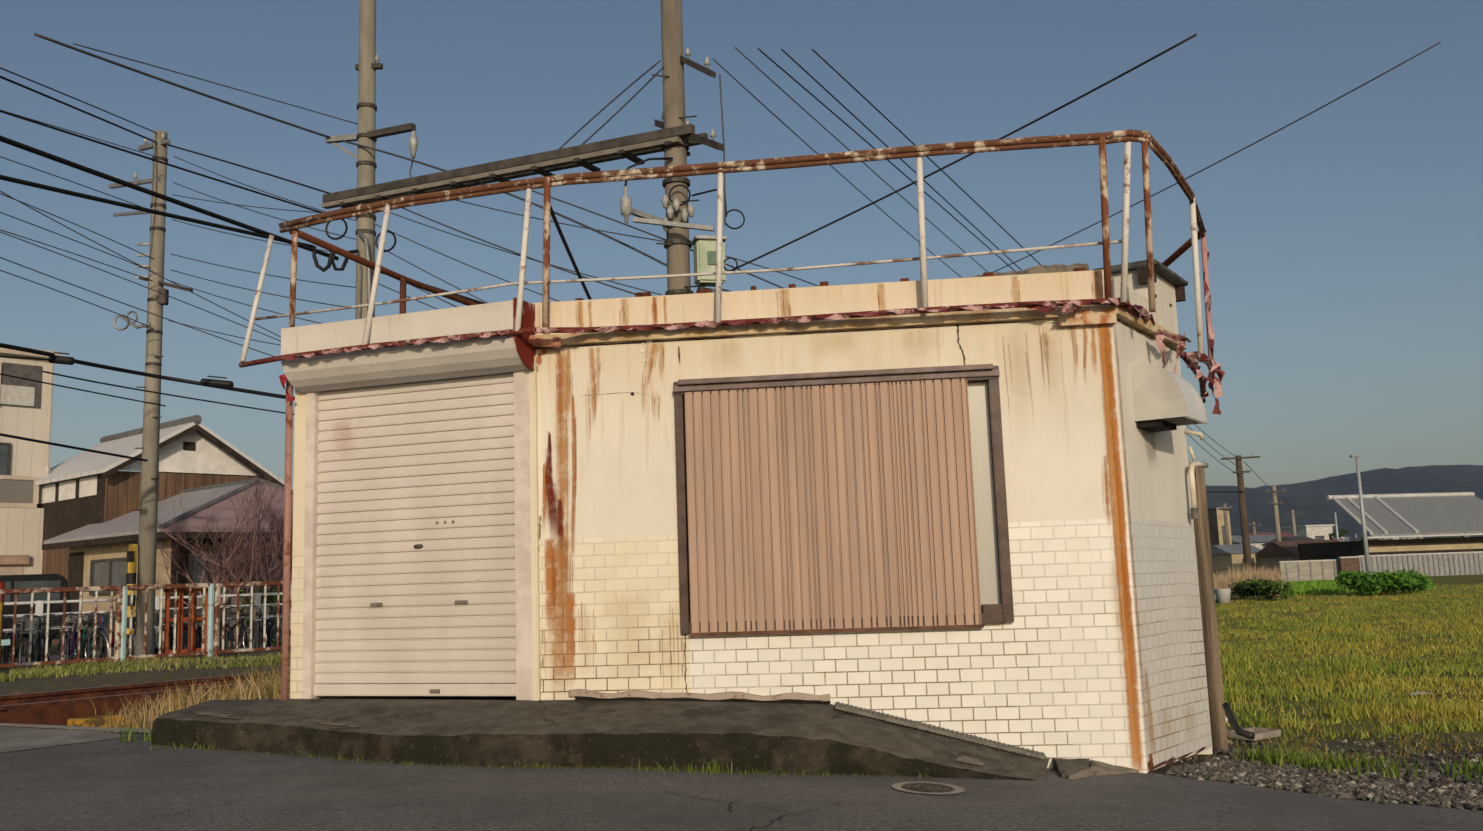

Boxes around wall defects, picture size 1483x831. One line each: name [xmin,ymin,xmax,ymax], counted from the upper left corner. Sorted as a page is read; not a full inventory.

corrosion [653,297,666,324]
crack [536,337,735,349]
crack [787,321,1030,365]
corrosion [543,349,595,664]
corrosion [1084,325,1141,765]